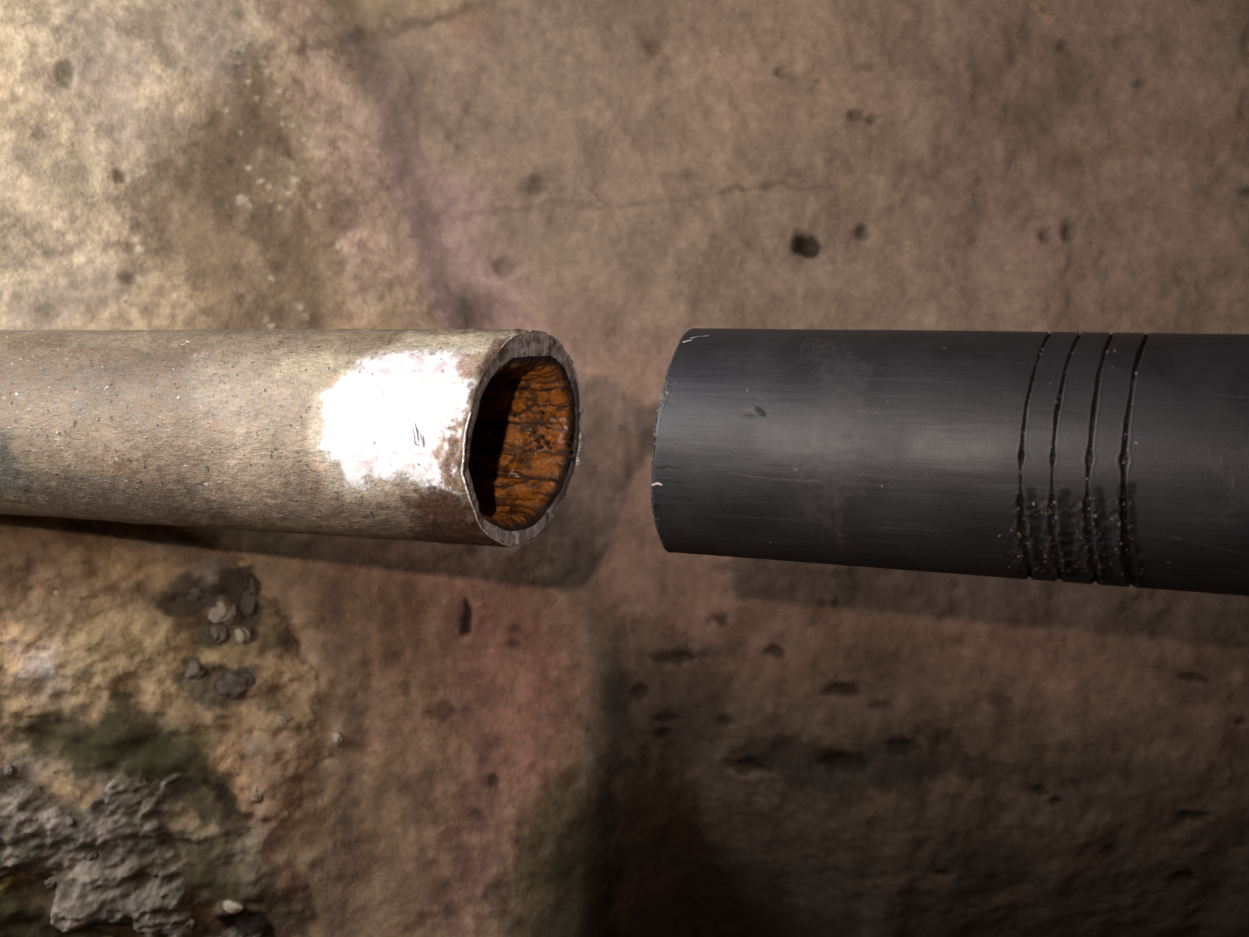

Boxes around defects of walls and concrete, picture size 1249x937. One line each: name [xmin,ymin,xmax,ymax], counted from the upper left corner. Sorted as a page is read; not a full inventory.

spalling [0,520,335,937]
damp [126,747,243,835]